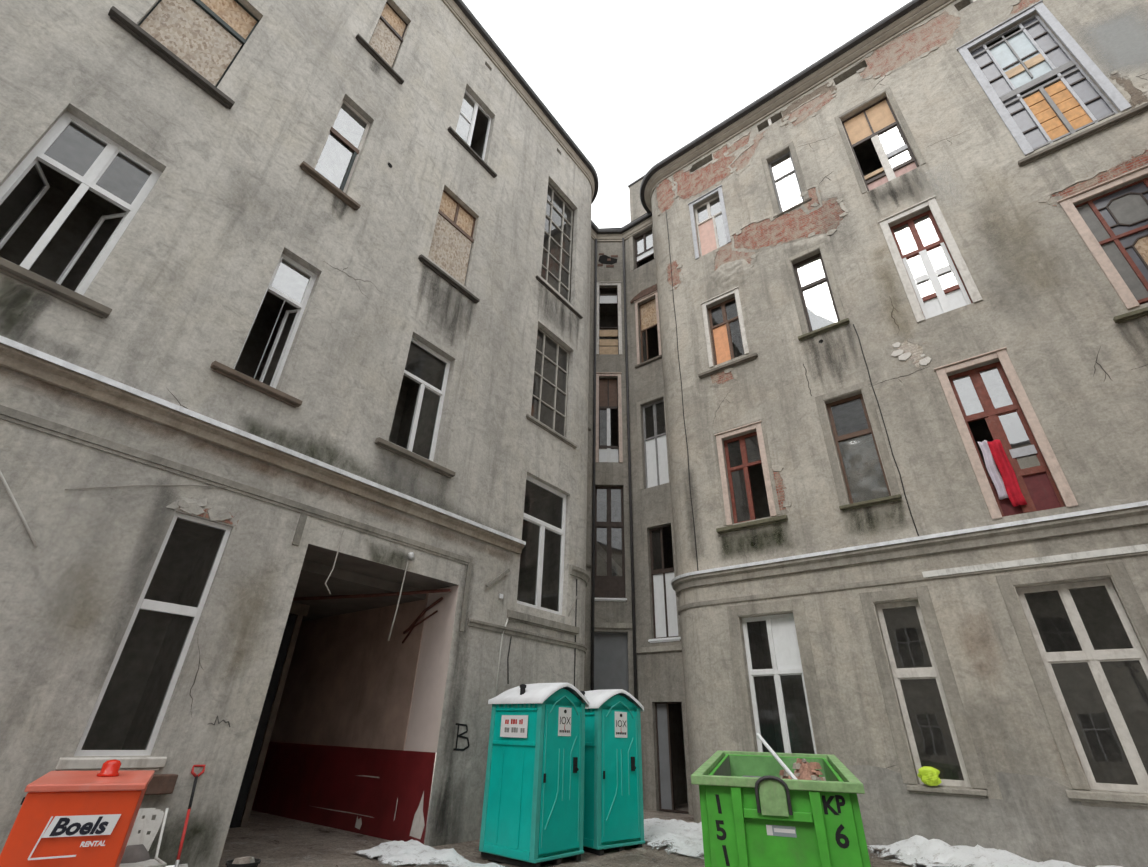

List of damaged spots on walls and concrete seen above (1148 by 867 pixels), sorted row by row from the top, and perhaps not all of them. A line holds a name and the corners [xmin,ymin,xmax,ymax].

spalling [655,80,839,217]
spalling [1039,149,1148,207]
spalling [711,184,850,273]
flaking render [891,338,932,371]